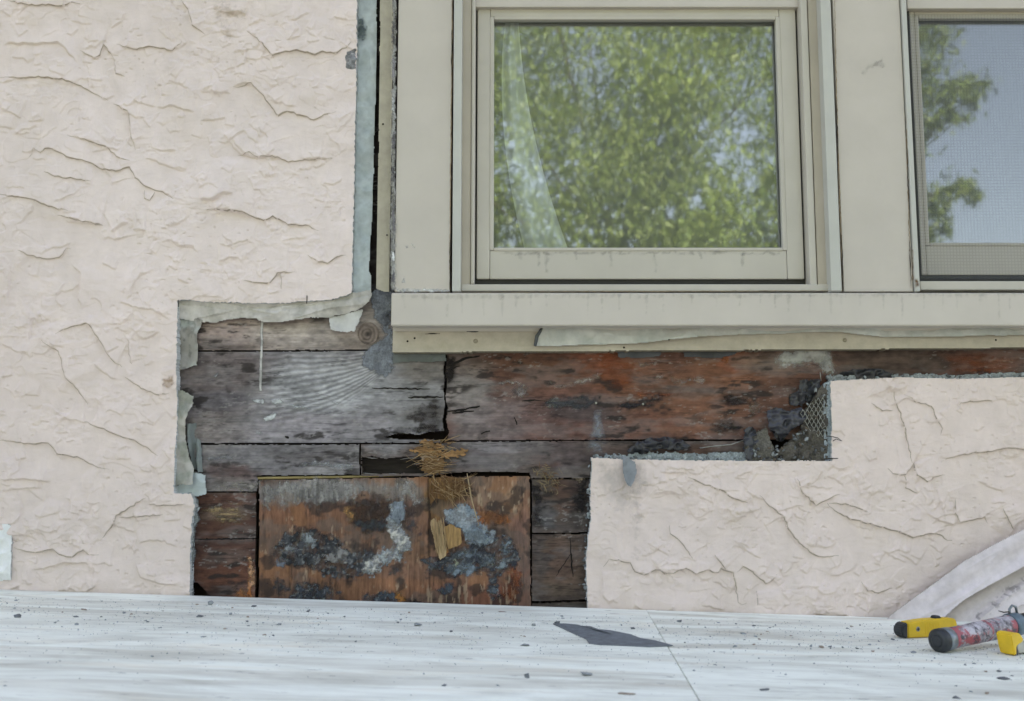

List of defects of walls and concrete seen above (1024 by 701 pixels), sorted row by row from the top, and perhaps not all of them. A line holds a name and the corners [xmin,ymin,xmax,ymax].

crack [373,387,490,434]
spalling [588,451,747,468]
leakage [219,461,423,534]
spalling [191,492,201,596]
leakage [273,526,376,600]
peeling [362,501,421,578]
leakage [364,591,421,603]
leakage [420,534,521,601]
spalling [582,483,590,601]